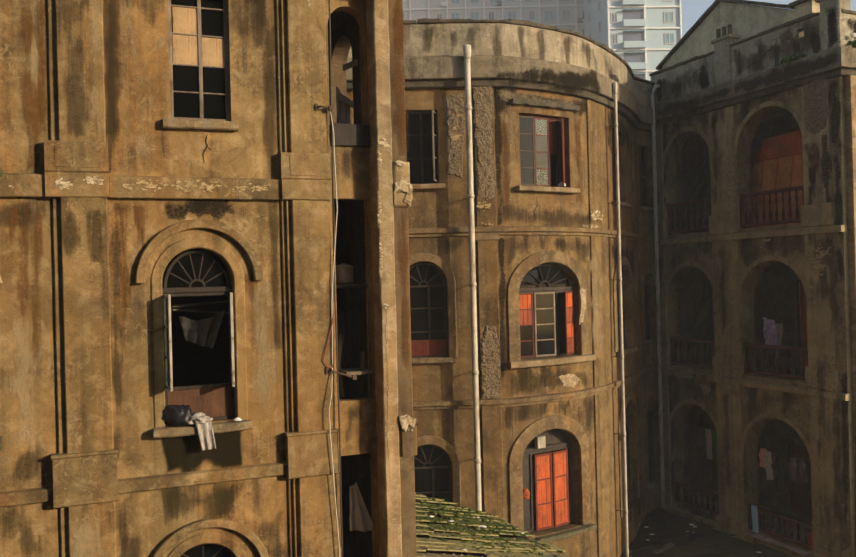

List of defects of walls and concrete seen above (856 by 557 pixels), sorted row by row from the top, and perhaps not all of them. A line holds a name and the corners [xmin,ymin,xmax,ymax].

water stain [59,0,130,171]
flaking render [442,92,466,179]
flaking render [493,88,572,108]
water stain [405,8,856,227]
peeling [55,178,73,190]
peeling [122,179,268,193]
water stain [612,246,634,275]
water stain [498,237,527,377]
flaking render [559,373,580,388]
water stain [833,374,849,523]